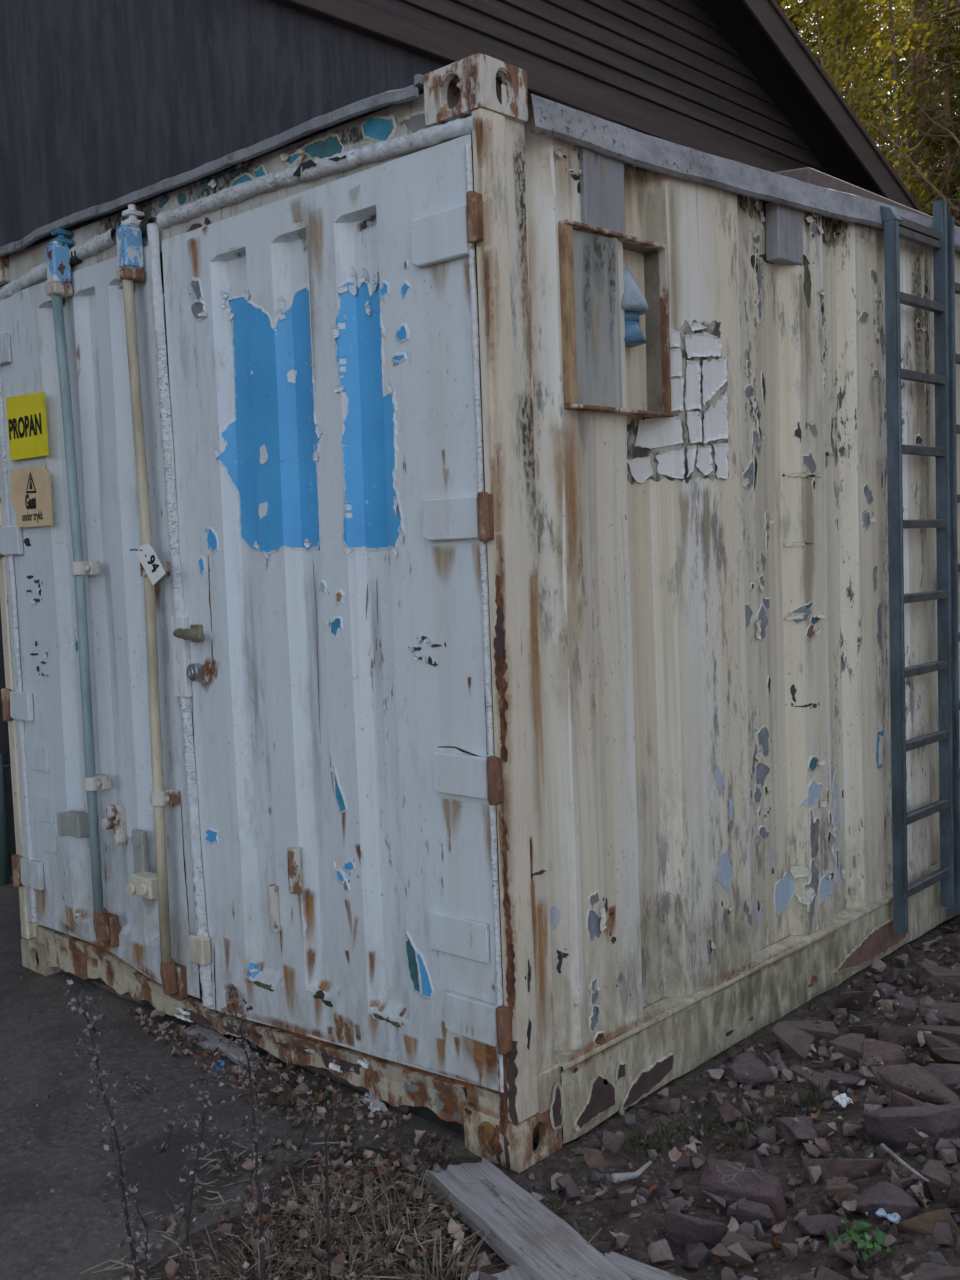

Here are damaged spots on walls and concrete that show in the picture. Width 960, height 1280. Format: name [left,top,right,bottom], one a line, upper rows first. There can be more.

peeling [361,110,429,142]
corrosion [465,198,497,339]
peeling [189,276,323,575]
peeling [333,259,412,557]
corrosion [404,444,553,1170]
peeling [707,726,846,965]
corrosion [60,908,111,975]
corrosion [299,891,314,930]
corrosion [284,951,329,1013]
peeling [405,929,434,1000]
corrosion [272,1001,384,1081]
peeling [550,1053,675,1134]